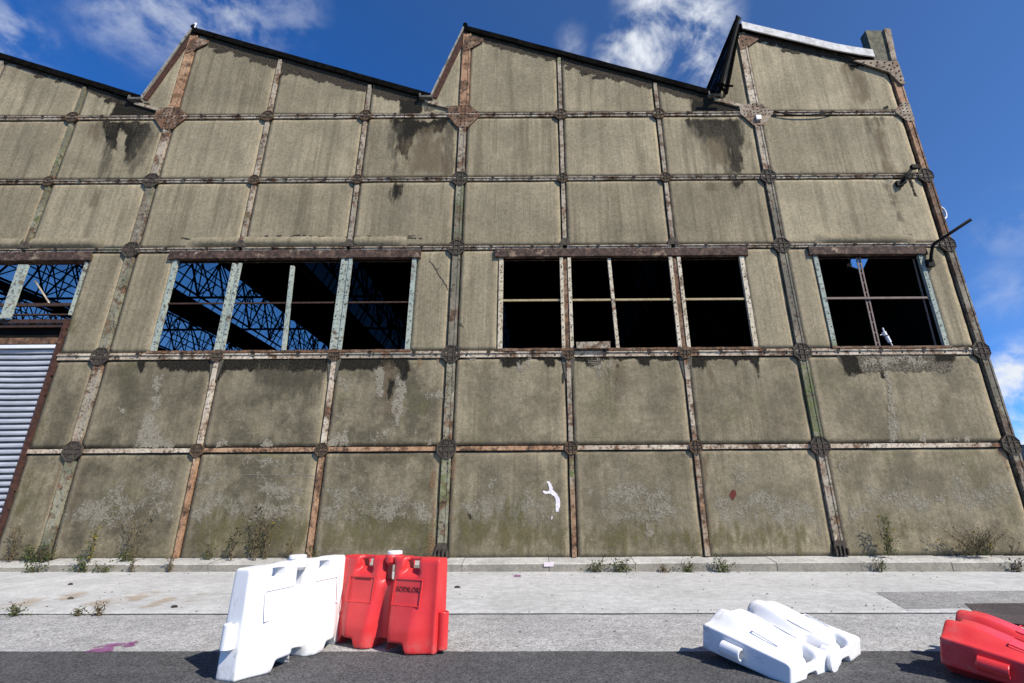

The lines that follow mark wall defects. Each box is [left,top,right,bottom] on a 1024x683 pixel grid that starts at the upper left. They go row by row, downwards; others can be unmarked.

water stain [93,93,155,174]
water stain [388,96,454,200]
water stain [685,93,745,188]